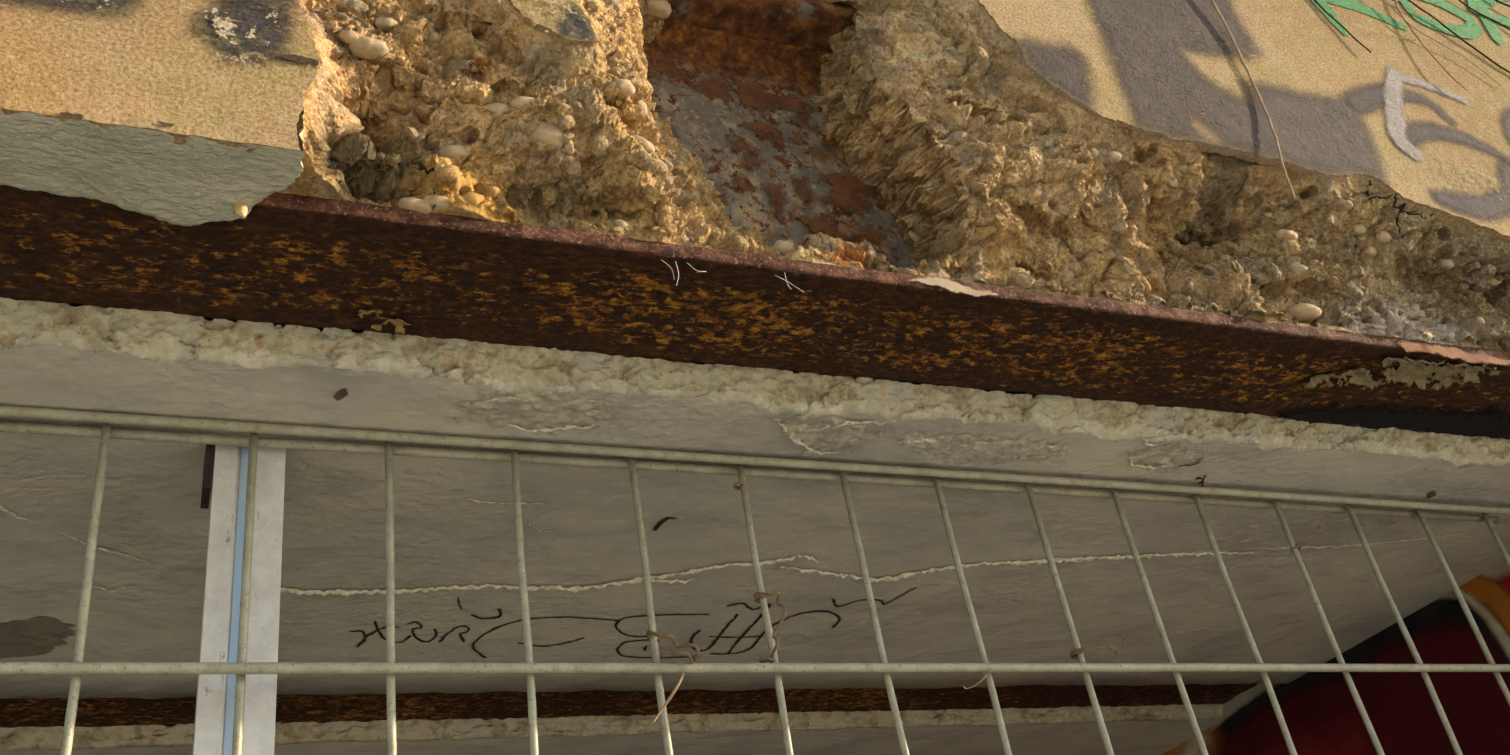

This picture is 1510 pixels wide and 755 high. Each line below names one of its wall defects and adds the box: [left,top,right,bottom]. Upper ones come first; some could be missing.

corrosion [647,58,887,269]
spalling [278,0,1510,390]
corrosion [358,310,411,336]
corrosion [1398,341,1510,365]
crack [280,531,1474,597]